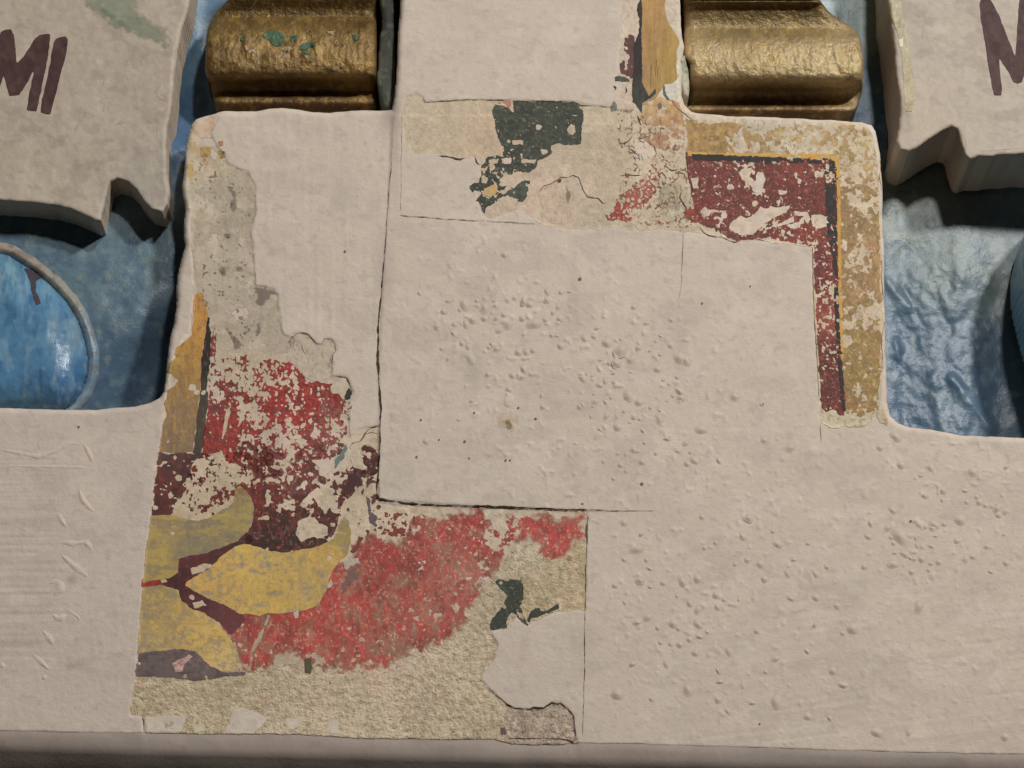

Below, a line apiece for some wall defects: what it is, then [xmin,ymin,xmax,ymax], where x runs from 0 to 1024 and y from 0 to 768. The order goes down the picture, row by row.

peeling [130,116,588,745]
crack [376,116,654,648]
peeling [401,0,888,429]